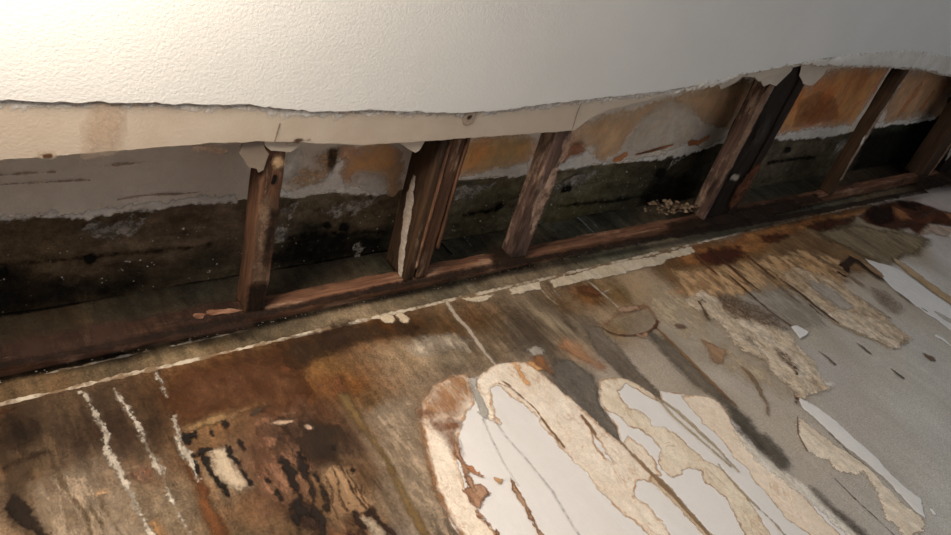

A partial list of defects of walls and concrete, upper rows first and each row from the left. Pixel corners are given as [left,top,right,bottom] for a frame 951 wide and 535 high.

damp [285,148,339,187]
damp [644,157,697,207]
damp [853,122,935,170]
damp [76,213,146,240]
damp [271,202,383,267]
damp [0,270,141,314]
flaking render [779,267,912,348]
flaking render [682,290,833,400]
damp [161,321,416,535]
damp [0,408,48,535]
damp [57,471,109,534]
flaking render [209,448,249,490]